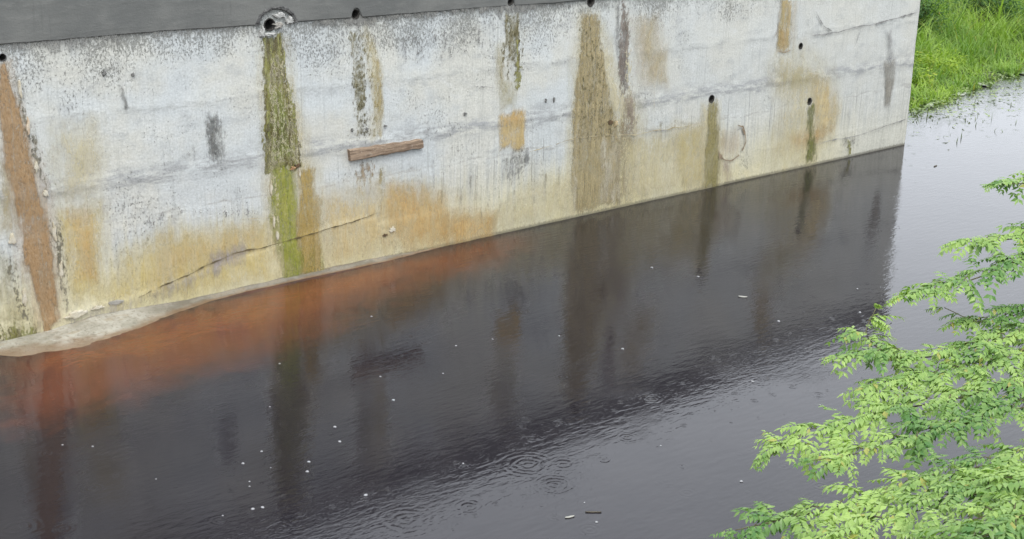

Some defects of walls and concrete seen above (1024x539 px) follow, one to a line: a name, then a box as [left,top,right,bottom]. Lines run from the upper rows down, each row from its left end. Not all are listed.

corrosion [0,63,59,331]
damp [19,100,47,197]
damp [111,33,324,313]
damp [348,31,383,132]
corrosion [501,111,525,150]
damp [505,13,522,101]
damp [509,1,720,223]
damp [807,104,816,162]
damp [44,219,70,312]
crack [139,212,378,298]